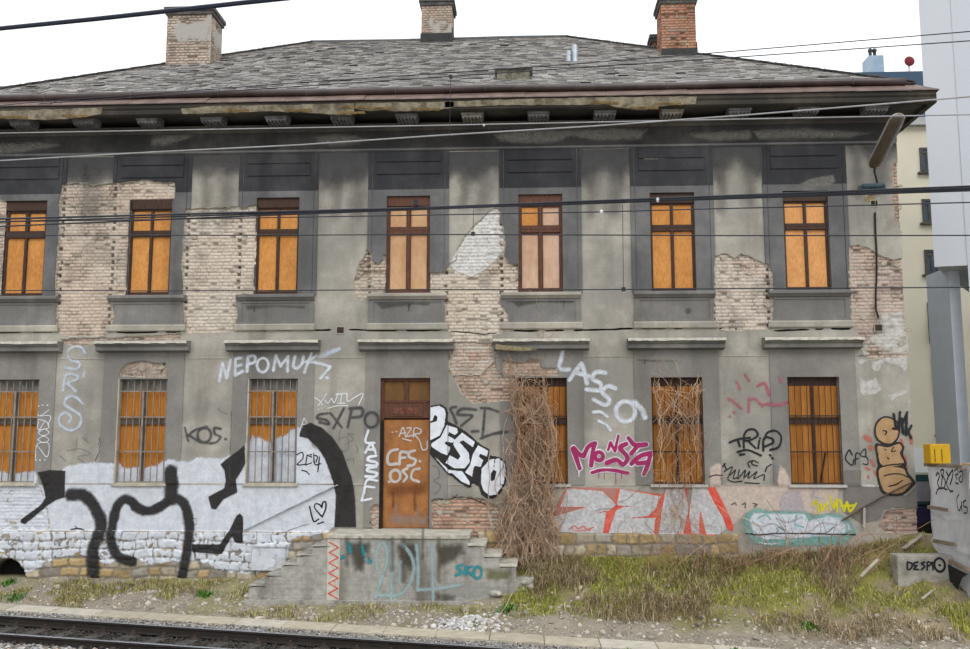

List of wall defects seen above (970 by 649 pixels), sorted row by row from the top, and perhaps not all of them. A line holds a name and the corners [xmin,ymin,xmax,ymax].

spalling [55,180,258,347]
spalling [353,249,386,302]
spalling [430,207,559,404]
spalling [713,253,774,332]
spalling [848,245,912,360]
spalling [431,496,503,538]